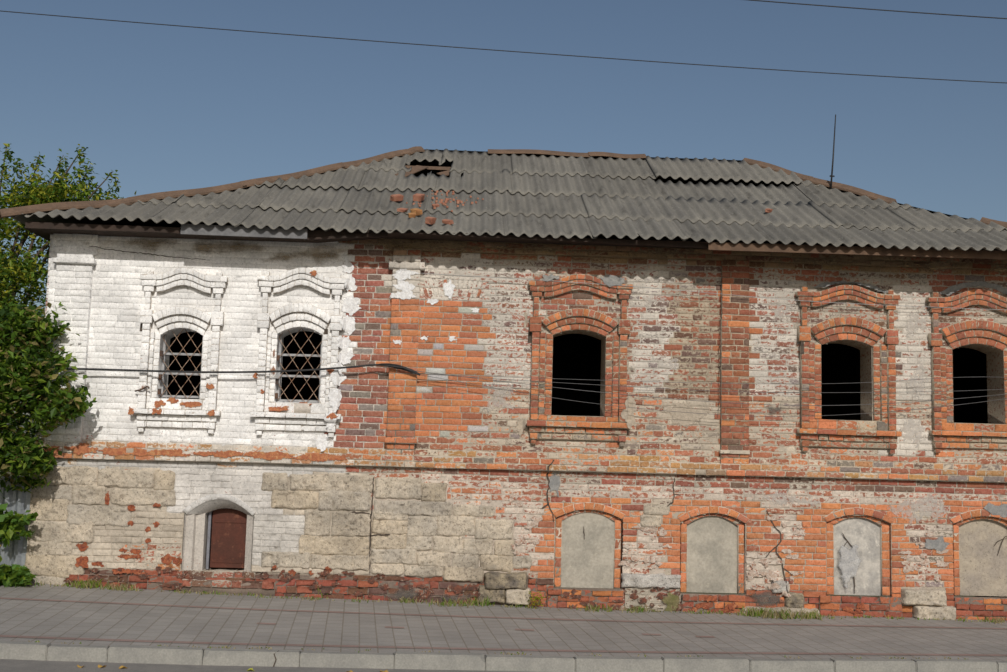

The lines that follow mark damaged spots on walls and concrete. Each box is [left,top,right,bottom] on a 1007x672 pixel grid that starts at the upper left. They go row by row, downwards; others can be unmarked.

peeling [389,269,420,300]
peeling [427,279,456,305]
spalling [261,565,296,582]
spalling [309,566,481,604]
spalling [747,549,802,597]
spalling [562,589,598,609]
spalling [610,587,739,613]